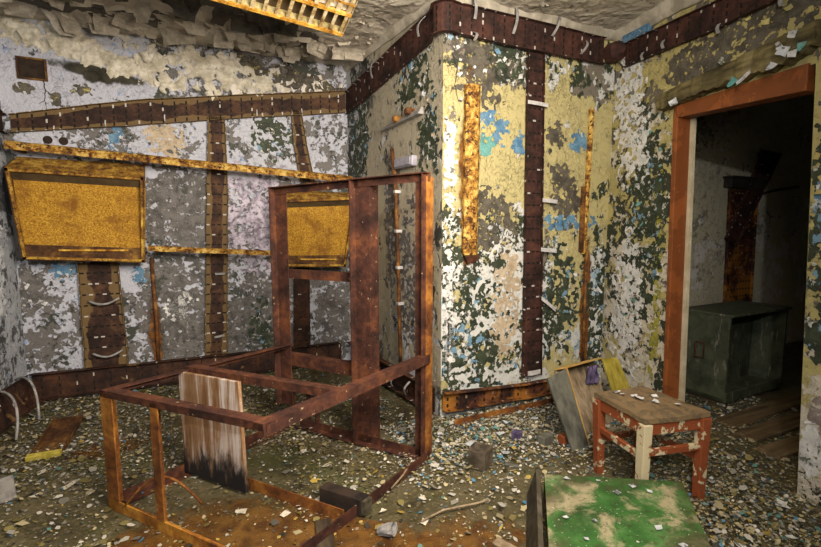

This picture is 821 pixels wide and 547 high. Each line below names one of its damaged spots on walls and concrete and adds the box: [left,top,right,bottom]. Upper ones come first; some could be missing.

spalling [0,0,400,101]
peeling [18,261,77,316]
peeling [132,124,207,360]
peeling [228,160,279,351]
peeling [251,116,293,169]
peeling [347,97,370,178]
peeling [384,185,415,353]
peeling [395,33,527,391]
corrosion [579,240,591,361]
peeling [543,56,678,381]
peeling [804,123,821,365]
peeling [799,396,821,478]